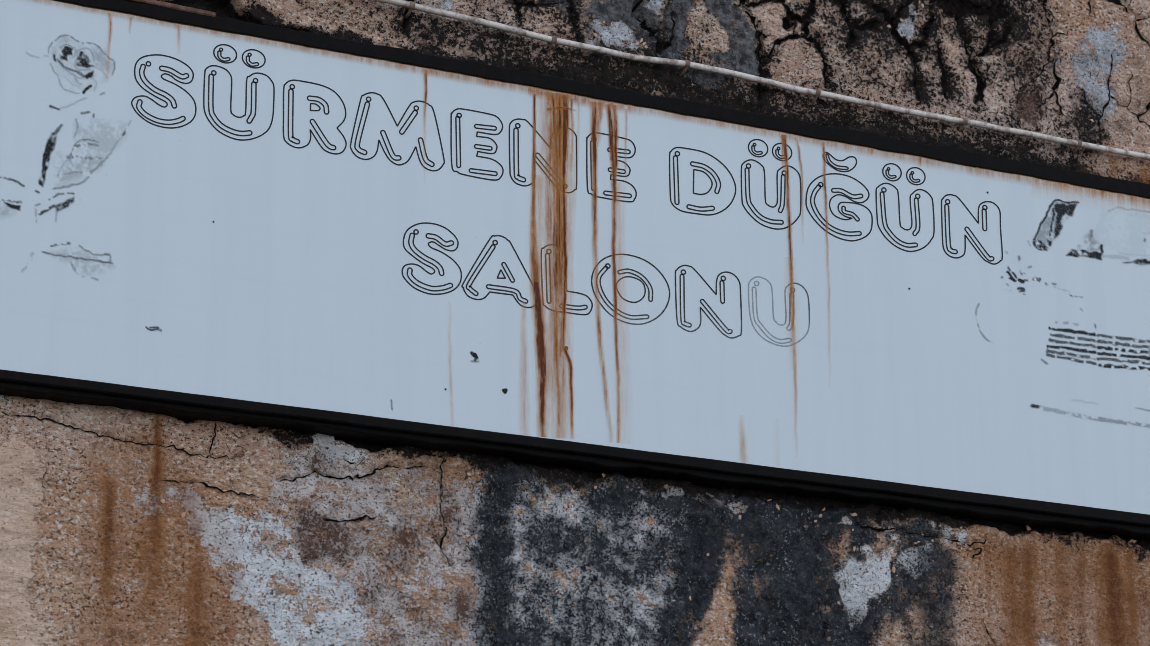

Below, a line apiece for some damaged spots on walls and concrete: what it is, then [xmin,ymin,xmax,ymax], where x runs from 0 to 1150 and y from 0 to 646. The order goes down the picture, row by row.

spalling [157,0,244,20]
water stain [235,0,1150,184]
crack [740,0,1012,104]
crack [1032,0,1150,132]
rust [103,481,115,591]
crack [2,412,259,498]
rust [151,416,165,553]
water stain [243,425,350,478]
crack [280,453,455,566]
peeling [127,433,748,646]
water stain [295,441,1150,646]
rust [1064,549,1150,646]